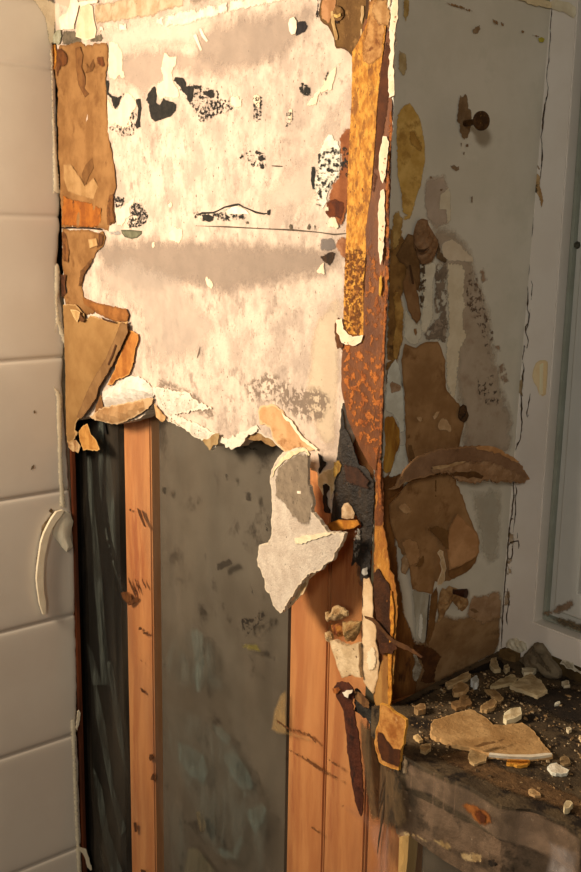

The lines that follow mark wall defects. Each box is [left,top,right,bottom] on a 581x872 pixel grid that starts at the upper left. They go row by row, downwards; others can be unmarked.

spalling [107,93,136,129]
damp [101,242,327,292]
spalling [311,134,340,274]
corrosion [325,129,350,225]
spalling [316,0,390,56]
crack [540,8,552,178]
damp [159,380,213,417]
damp [247,301,339,443]
corrosion [336,43,419,700]
crack [516,264,533,448]
crack [501,482,520,643]
spalling [445,657,548,725]